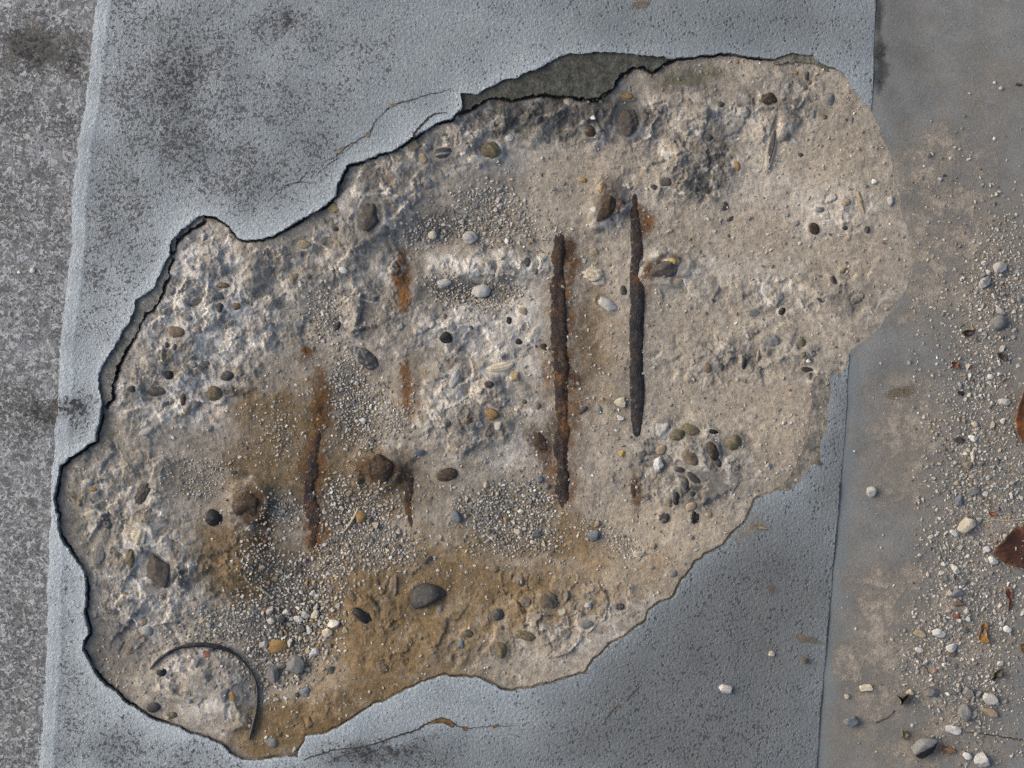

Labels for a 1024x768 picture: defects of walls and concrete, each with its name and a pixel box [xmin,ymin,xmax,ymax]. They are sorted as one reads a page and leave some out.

crack [268,88,451,202]
rust [393,250,410,310]
spalling [55,52,917,759]
rust [200,370,339,604]
rust [347,450,411,512]
crack [304,717,513,760]